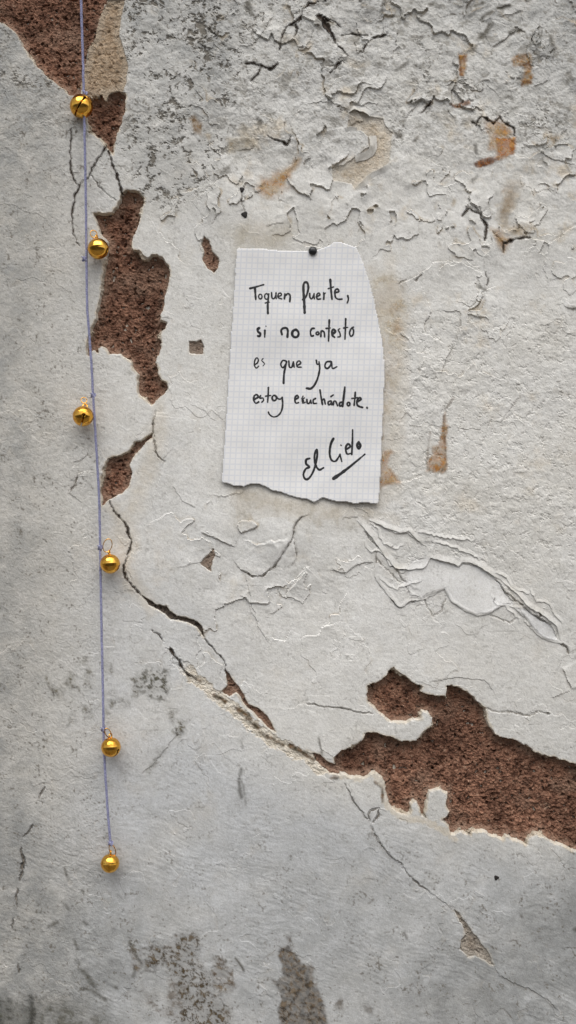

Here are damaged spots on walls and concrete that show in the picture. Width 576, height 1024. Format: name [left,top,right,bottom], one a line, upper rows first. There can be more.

spalling [0,0,126,153]
peeling [332,102,392,191]
corrosion [475,123,515,167]
spalling [88,191,170,404]
flaking render [202,237,219,272]
spalling [101,435,152,505]
crack [109,500,141,596]
crack [151,630,198,681]
spalling [222,670,275,731]
spalling [313,670,576,849]
crack [348,790,427,890]